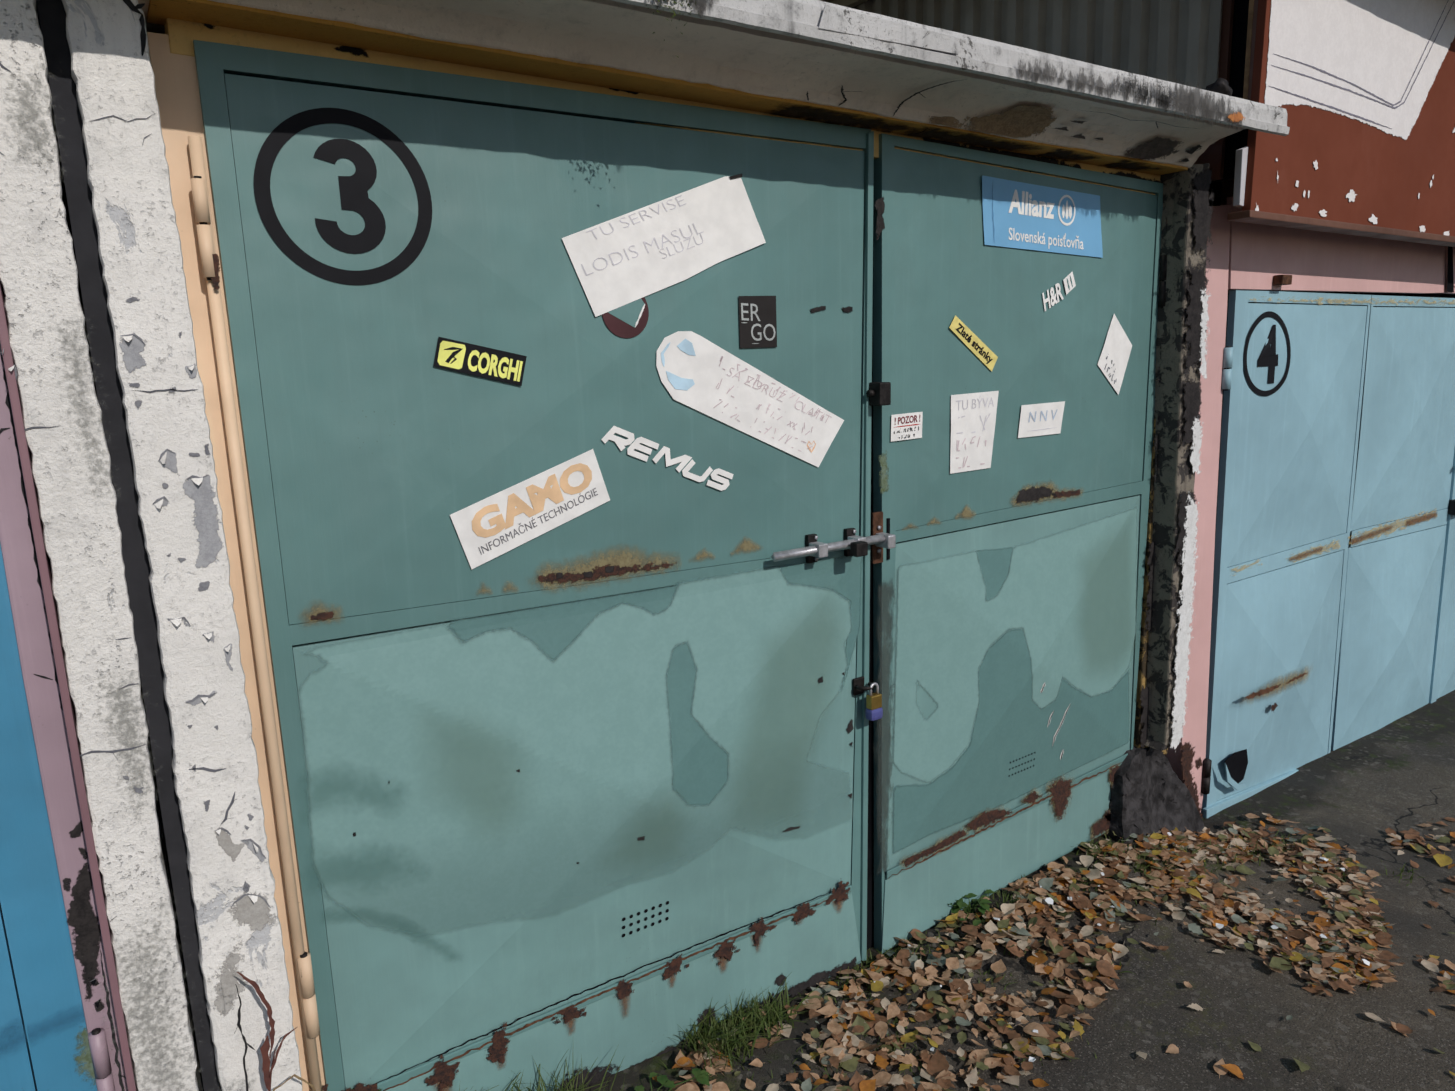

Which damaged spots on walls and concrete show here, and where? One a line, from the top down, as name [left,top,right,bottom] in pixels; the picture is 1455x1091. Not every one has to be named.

peeling [1276,158,1327,217]
corrosion [211,254,221,290]
peeling [119,333,147,408]
peeling [153,444,224,591]
corrosion [1012,484,1080,505]
corrosion [538,550,677,589]
peeling [186,691,217,706]
peeling [215,814,266,862]
corrosion [888,762,1122,879]
peeling [63,821,104,1012]
peeling [228,881,276,931]
corrosion [322,881,857,1091]